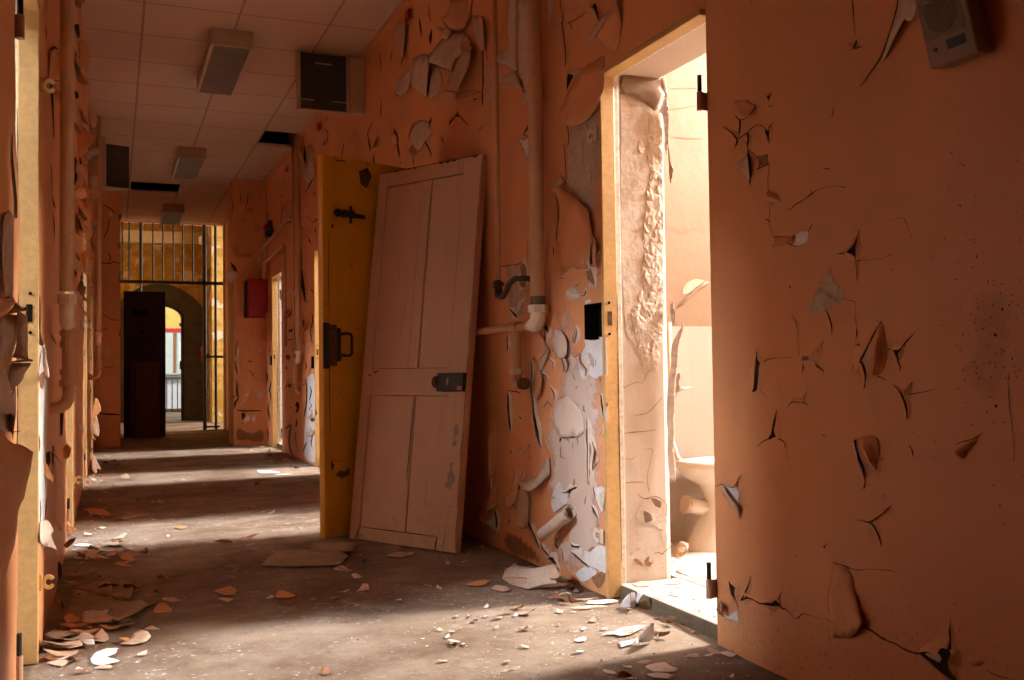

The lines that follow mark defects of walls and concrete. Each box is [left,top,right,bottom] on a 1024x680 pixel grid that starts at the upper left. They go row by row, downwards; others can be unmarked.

peeling [393,0,528,107]
peeling [74,24,122,339]
peeling [548,0,621,304]
crack [724,92,846,237]
flaking render [231,306,317,462]
flaking render [473,317,609,588]
flaking render [619,75,709,482]
crack [758,230,891,449]
crack [888,331,916,370]
crack [740,576,831,623]
crack [823,506,898,574]
crack [861,615,961,680]